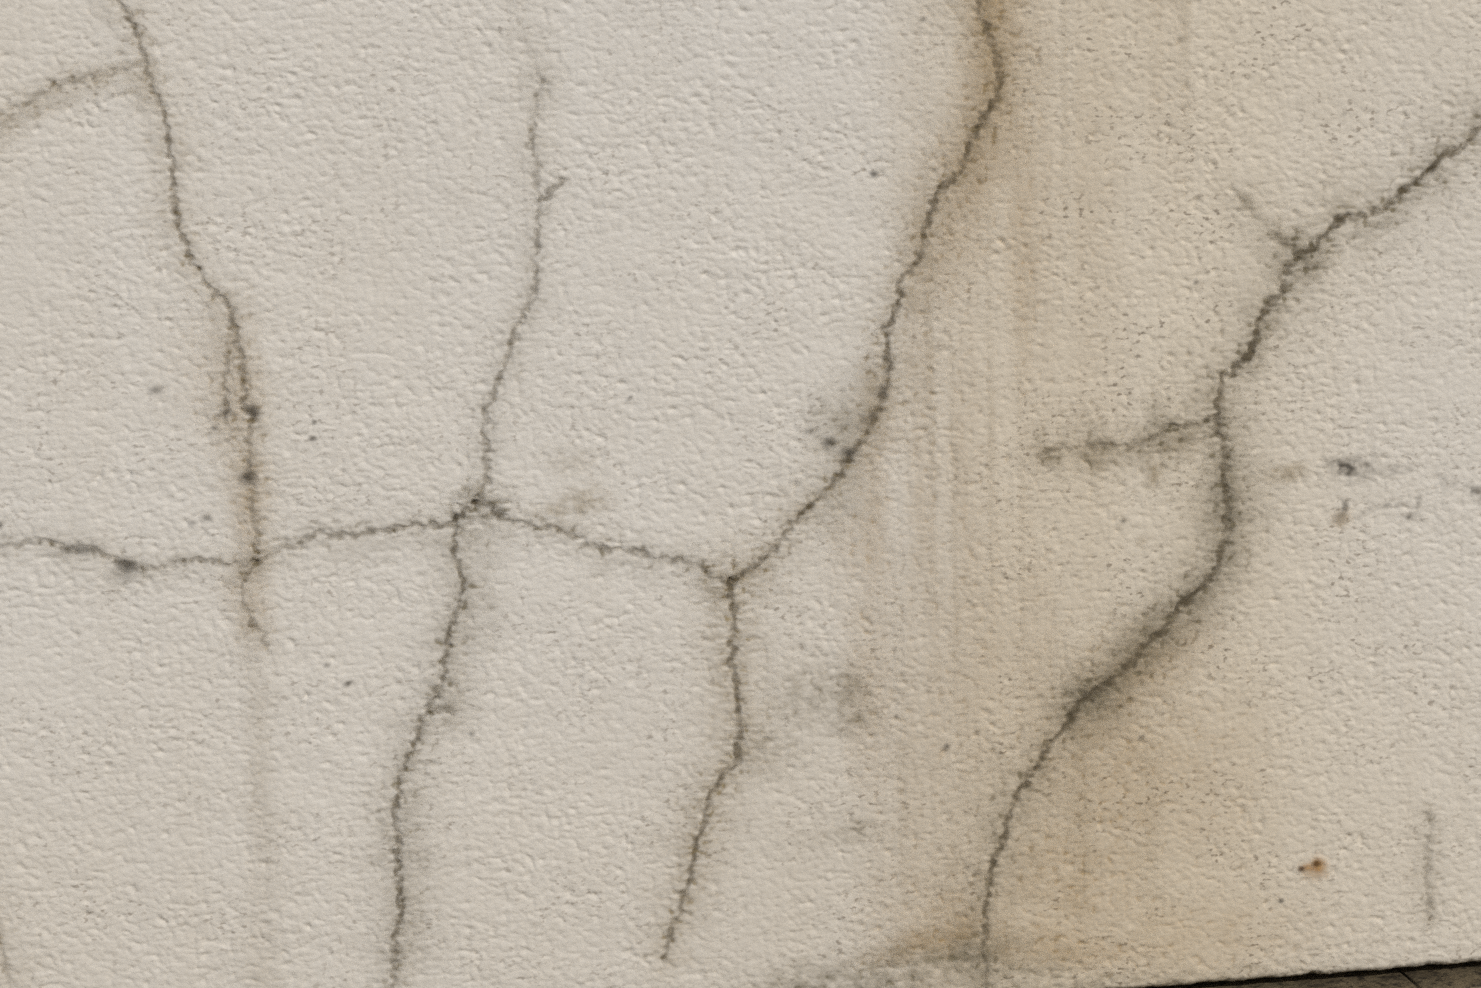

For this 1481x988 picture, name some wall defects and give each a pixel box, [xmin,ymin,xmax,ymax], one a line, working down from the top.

crack [884,75,1008,370]
crack [789,443,860,523]
crack [972,115,1481,967]
crack [393,584,477,805]
crack [661,556,769,959]